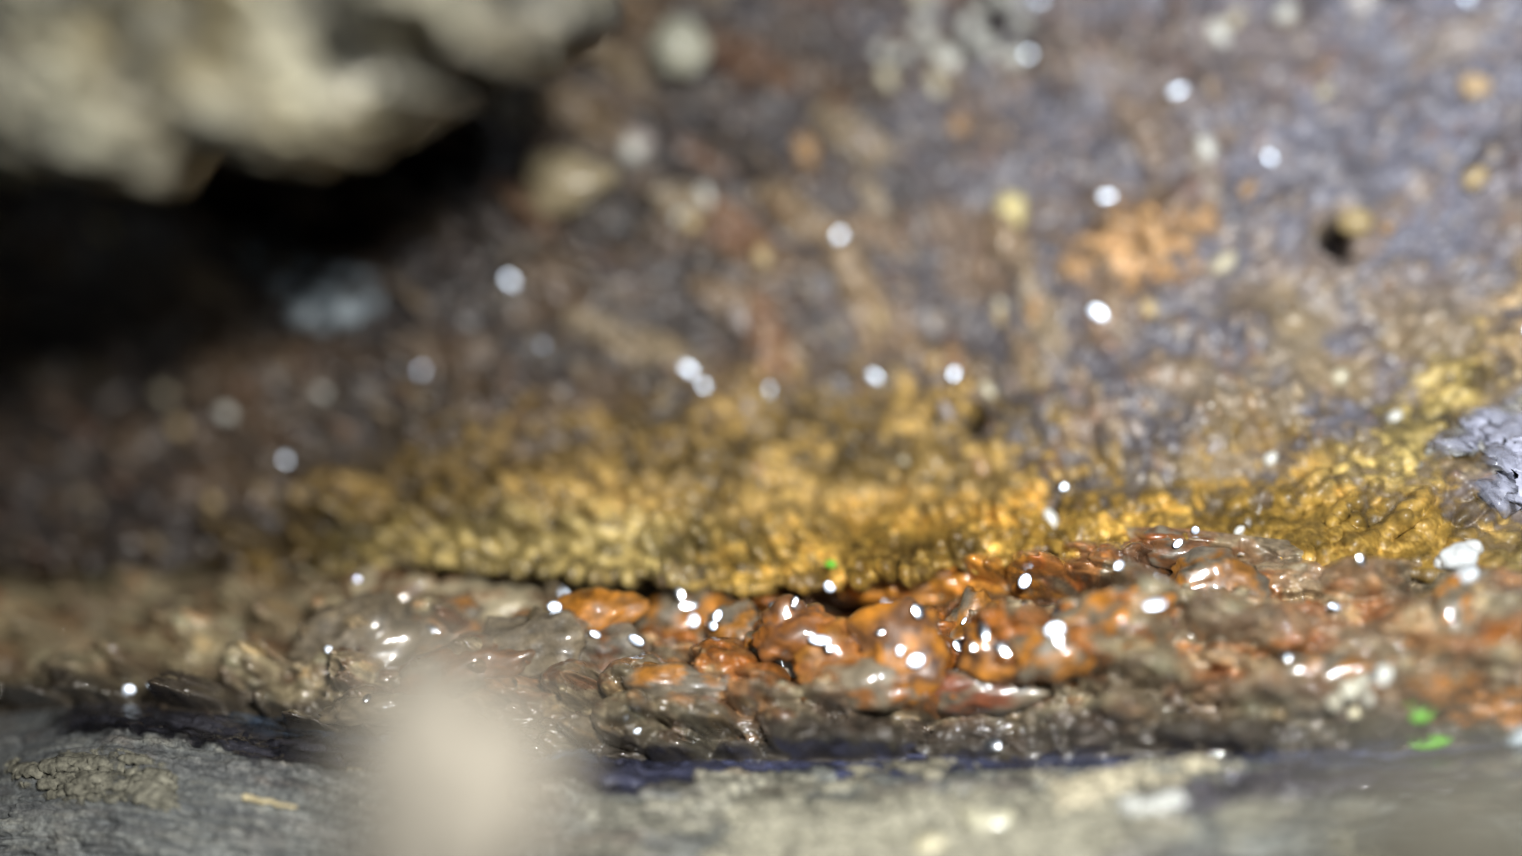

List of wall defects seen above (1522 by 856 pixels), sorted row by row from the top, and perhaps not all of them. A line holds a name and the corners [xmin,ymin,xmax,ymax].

corrosion [1059,187,1220,293]
corrosion [0,265,1522,762]